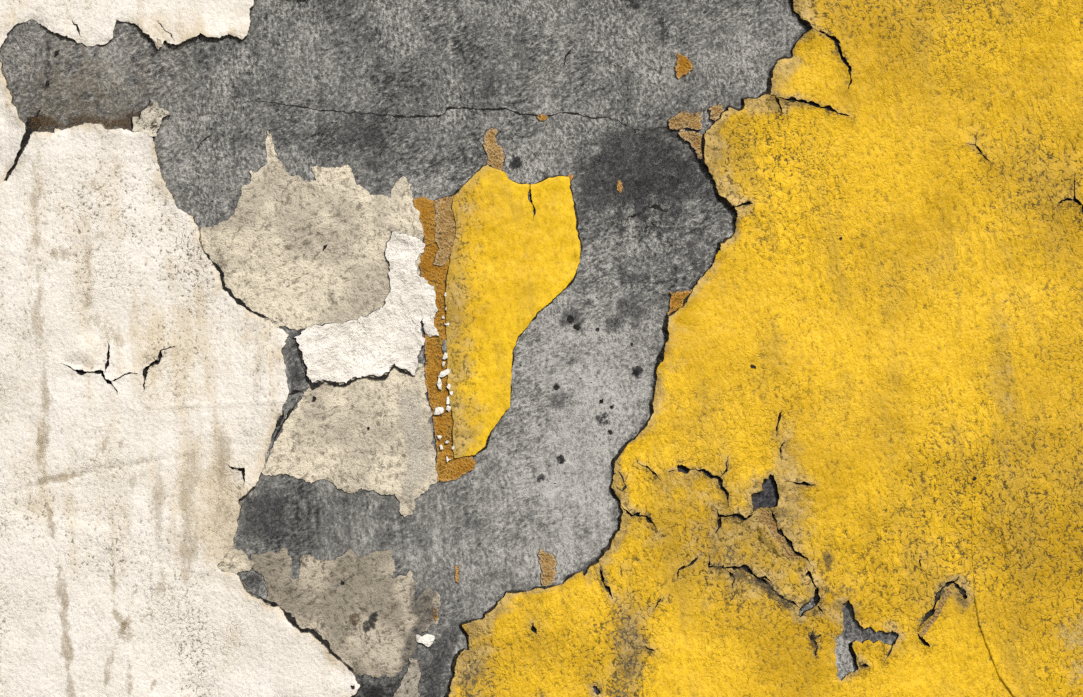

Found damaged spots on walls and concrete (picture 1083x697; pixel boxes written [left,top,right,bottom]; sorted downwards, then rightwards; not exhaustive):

crack [819,31,852,86]
crack [7,110,41,178]
crack [237,101,665,144]
crack [775,97,847,116]
crack [1058,181,1083,213]
crack [68,342,175,392]
peeling [0,0,811,697]
crack [616,463,822,654]
peeling [799,588,819,616]
peeling [835,600,898,680]